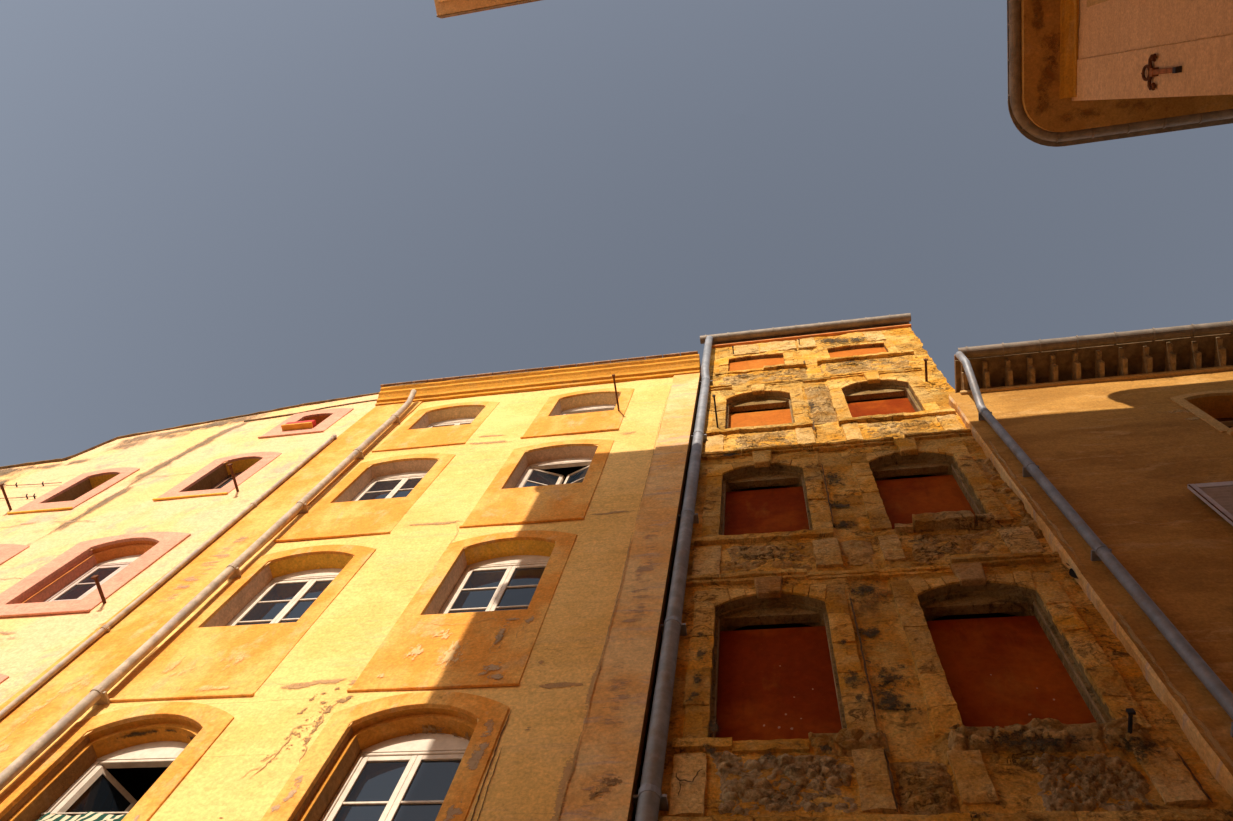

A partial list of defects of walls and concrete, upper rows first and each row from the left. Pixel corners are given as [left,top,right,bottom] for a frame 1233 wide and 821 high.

water stain [0,459,88,489]
water stain [57,416,252,530]
peeling [261,677,356,763]